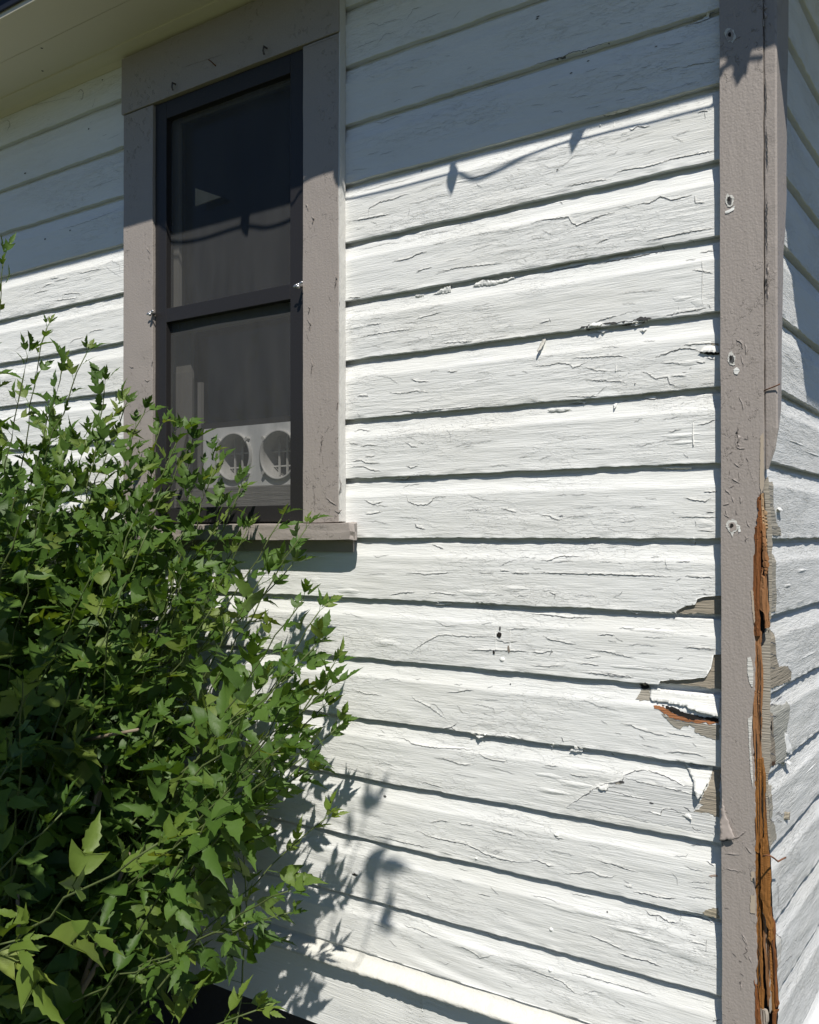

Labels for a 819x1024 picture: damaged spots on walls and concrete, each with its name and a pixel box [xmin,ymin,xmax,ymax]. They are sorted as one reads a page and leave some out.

crack [347,178,715,347]
crack [313,370,489,595]
crack [417,398,817,678]
crack [524,340,746,457]
crack [343,678,523,788]
crack [373,572,797,995]
peeling [568,731,719,836]
crack [504,965,653,1022]